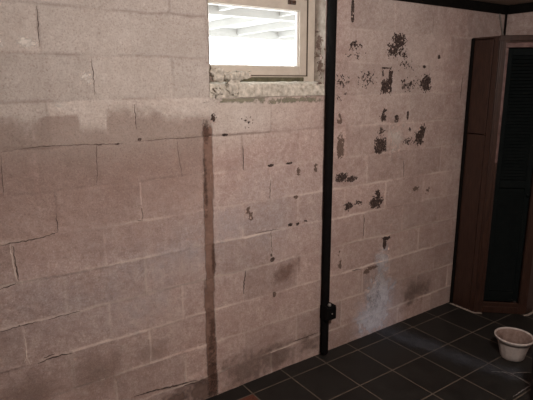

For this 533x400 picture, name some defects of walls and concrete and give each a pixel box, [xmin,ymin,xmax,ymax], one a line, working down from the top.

crack [0,215,58,290]